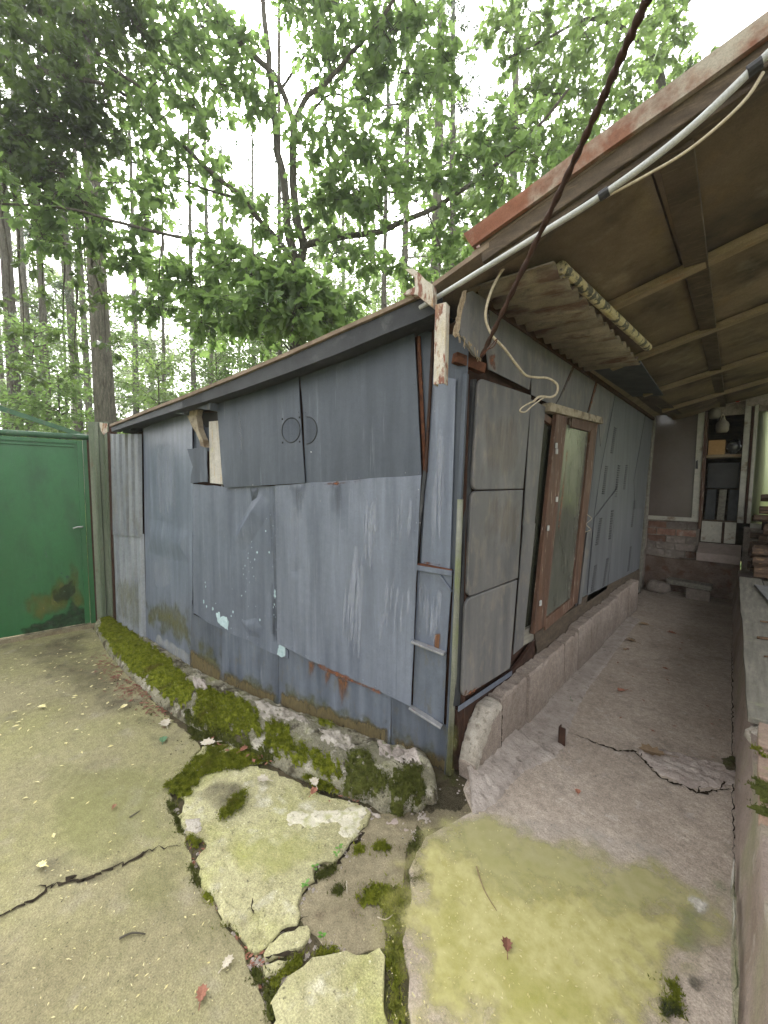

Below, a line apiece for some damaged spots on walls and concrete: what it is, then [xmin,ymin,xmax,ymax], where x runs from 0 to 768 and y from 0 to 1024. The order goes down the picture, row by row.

corrosion [464,11,768,250]
water stain [24,581,89,653]
peeling [203,586,234,630]
corrosion [309,663,381,699]
crack [728,645,736,756]
crack [0,845,178,916]
crack [572,733,738,1024]